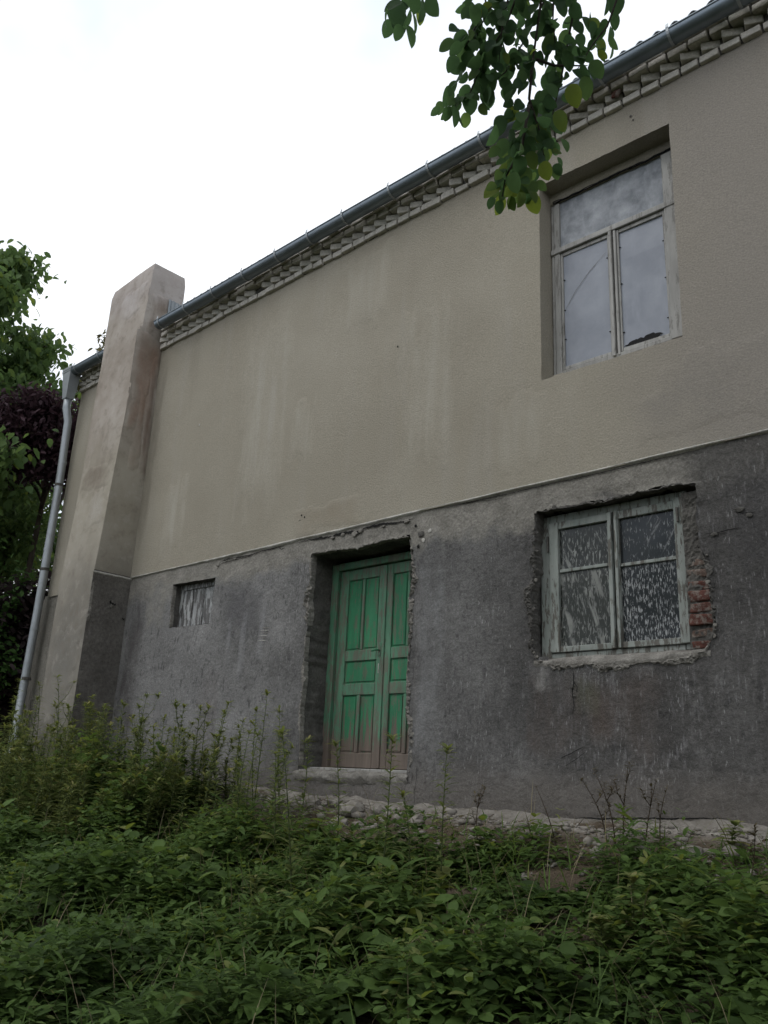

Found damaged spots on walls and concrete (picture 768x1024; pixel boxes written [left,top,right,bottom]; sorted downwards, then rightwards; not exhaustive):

spalling [297,524,432,772]
spalling [523,483,717,672]